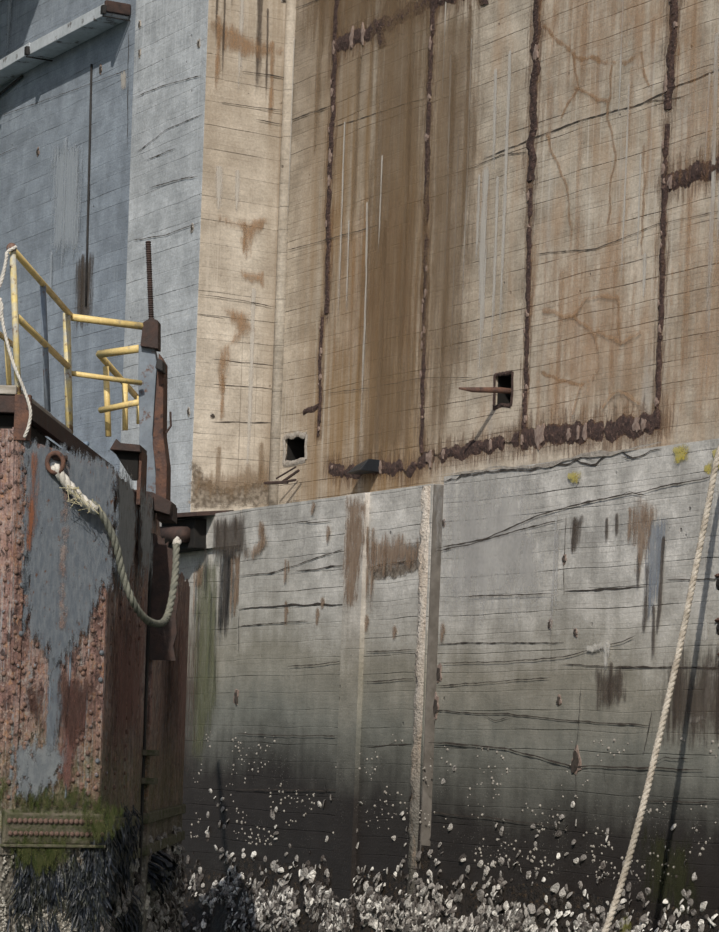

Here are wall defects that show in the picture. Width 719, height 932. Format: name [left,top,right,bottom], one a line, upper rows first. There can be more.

corrosion [215,18,274,115]
crack [432,69,719,180]
corrosion [241,219,264,249]
corrosion [231,311,250,341]
corrosion [220,351,229,413]
corrosion [26,453,38,550]
peeling [8,438,154,801]
leakage [204,515,247,677]
leakage [645,518,665,614]
corrosion [27,686,44,717]
leakage [587,642,625,709]